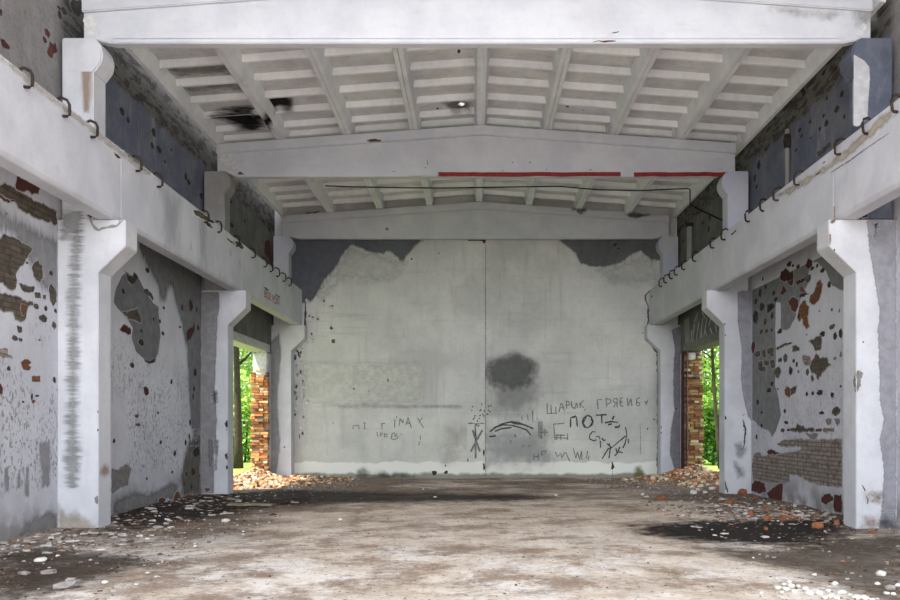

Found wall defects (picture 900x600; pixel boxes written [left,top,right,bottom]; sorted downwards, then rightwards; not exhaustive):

spalling [815,142,831,177]
spalling [0,233,57,382]
leakage [60,211,84,488]
peeling [114,267,165,368]
spalling [738,258,843,514]
peeling [861,214,897,528]
spalling [111,464,132,494]